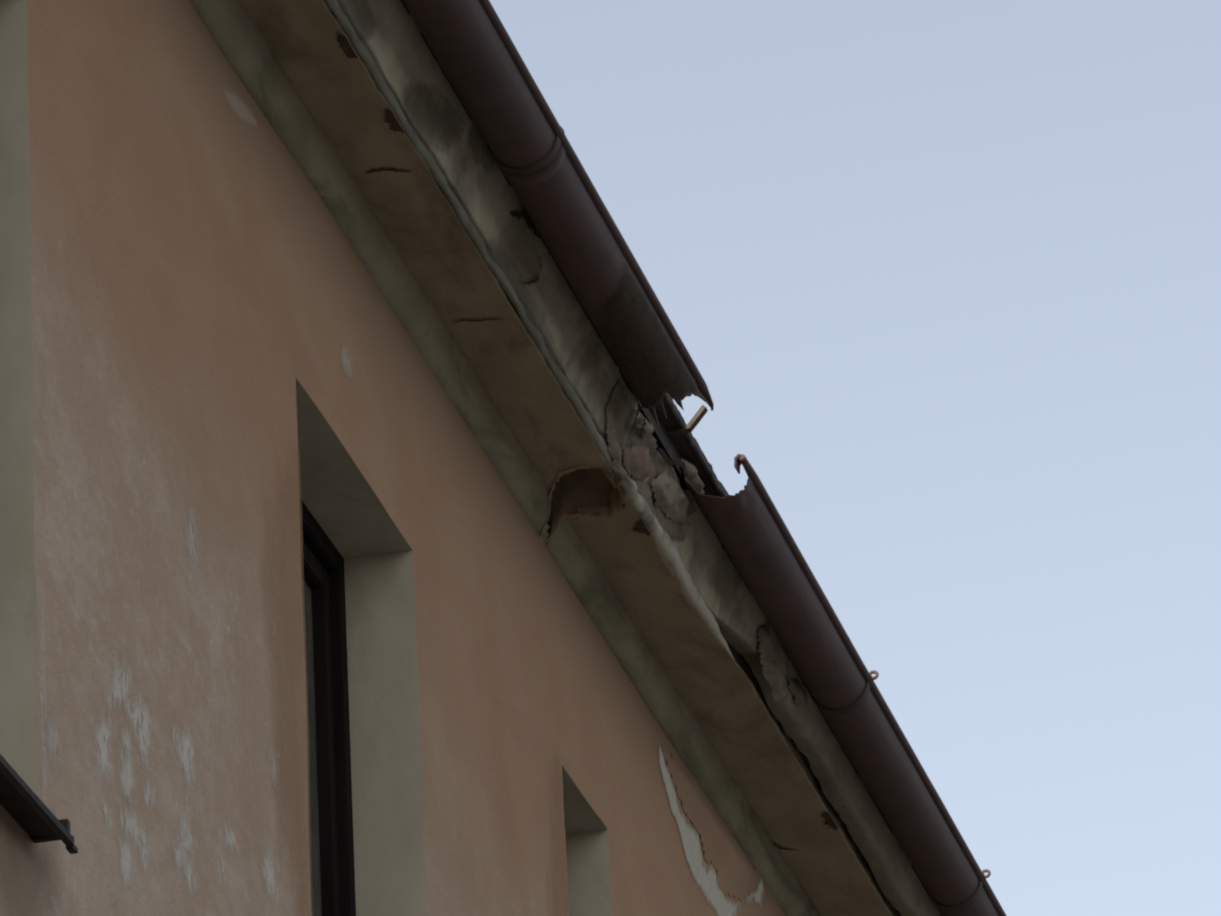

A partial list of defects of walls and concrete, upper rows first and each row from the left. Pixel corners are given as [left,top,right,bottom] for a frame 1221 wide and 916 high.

flaking render [540,379,705,549]
peeling [96,663,154,807]
peeling [103,805,148,884]
flaking render [659,745,763,916]